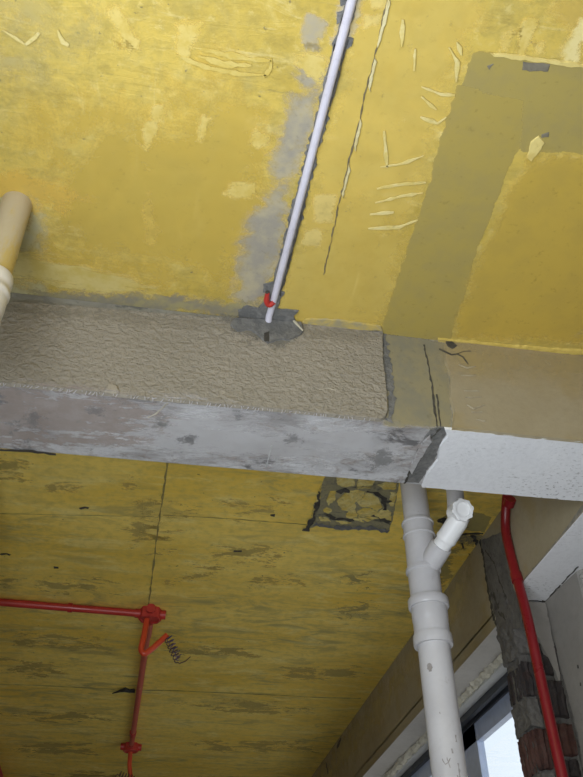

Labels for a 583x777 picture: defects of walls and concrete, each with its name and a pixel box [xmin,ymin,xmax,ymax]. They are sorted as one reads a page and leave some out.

flaking render [302,333,452,533]
leakage [215,544,305,589]